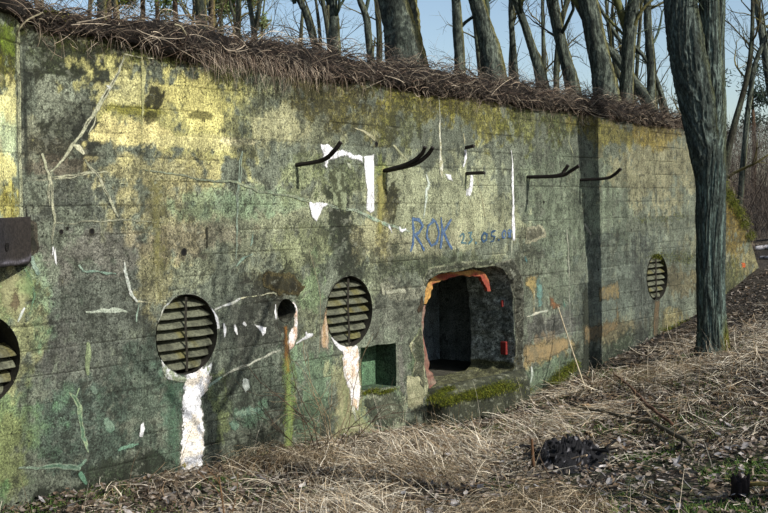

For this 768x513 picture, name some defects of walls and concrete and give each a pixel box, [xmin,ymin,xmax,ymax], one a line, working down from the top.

crack [27,54,163,265]
crack [78,262,167,322]
leakage [161,360,212,472]
leakage [331,337,375,439]
spalling [360,258,569,431]